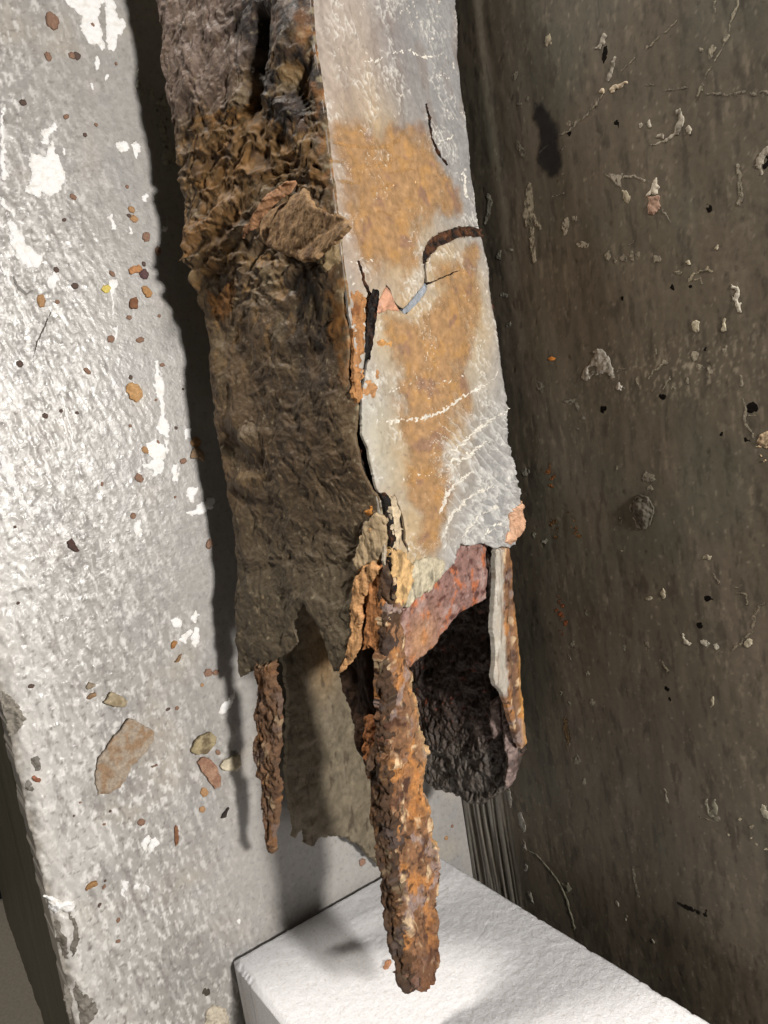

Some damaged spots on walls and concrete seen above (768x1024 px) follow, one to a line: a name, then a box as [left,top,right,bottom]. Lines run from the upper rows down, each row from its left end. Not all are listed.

water stain [534,107,560,175]
crack [423,225,484,285]
crack [345,260,406,601]
rust [389,248,477,545]
peeling [505,501,548,545]